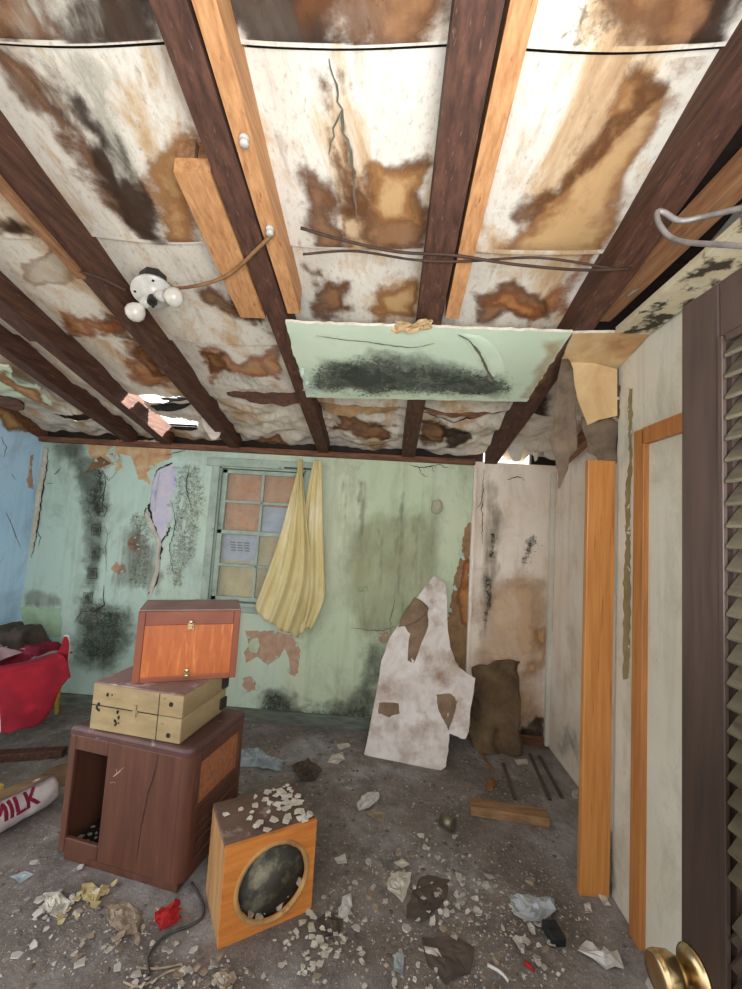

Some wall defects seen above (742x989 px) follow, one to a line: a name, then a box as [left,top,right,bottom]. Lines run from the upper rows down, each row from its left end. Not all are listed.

damp [230,0,447,45]
damp [0,0,202,245]
crack [328,59,357,221]
damp [299,142,431,249]
damp [504,71,669,263]
damp [314,356,510,395]
peeling [86,439,177,540]
damp [57,444,130,668]
peeling [447,519,474,671]
damp [485,577,501,621]
peeling [242,676,256,693]
peeling [244,630,301,677]